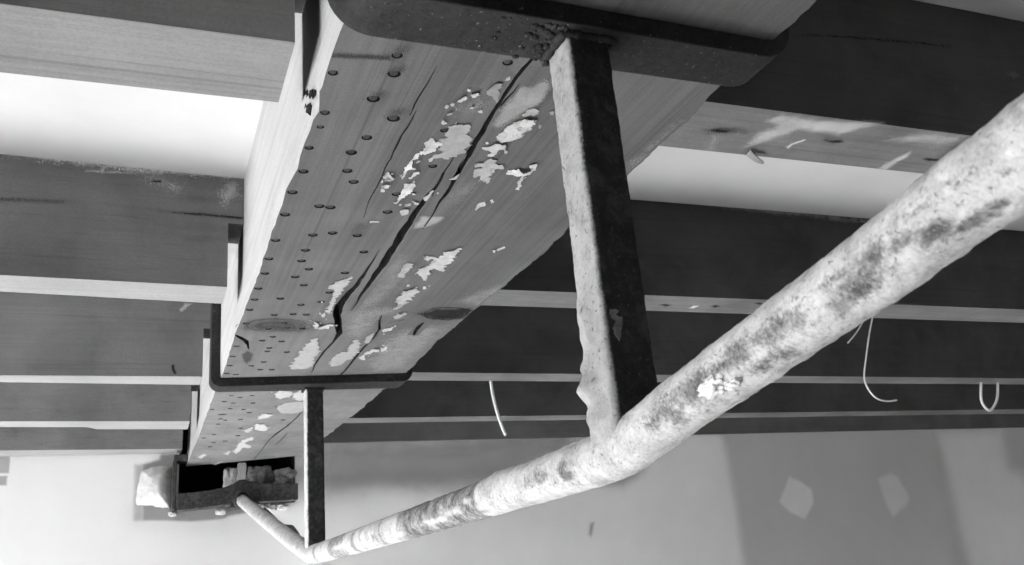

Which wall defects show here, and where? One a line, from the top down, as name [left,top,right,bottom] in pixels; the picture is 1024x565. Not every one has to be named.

peeling [381,76,554,216]
crack [311,59,534,375]
peeling [289,248,462,369]
spalling [178,390,304,494]
crack [254,411,303,459]